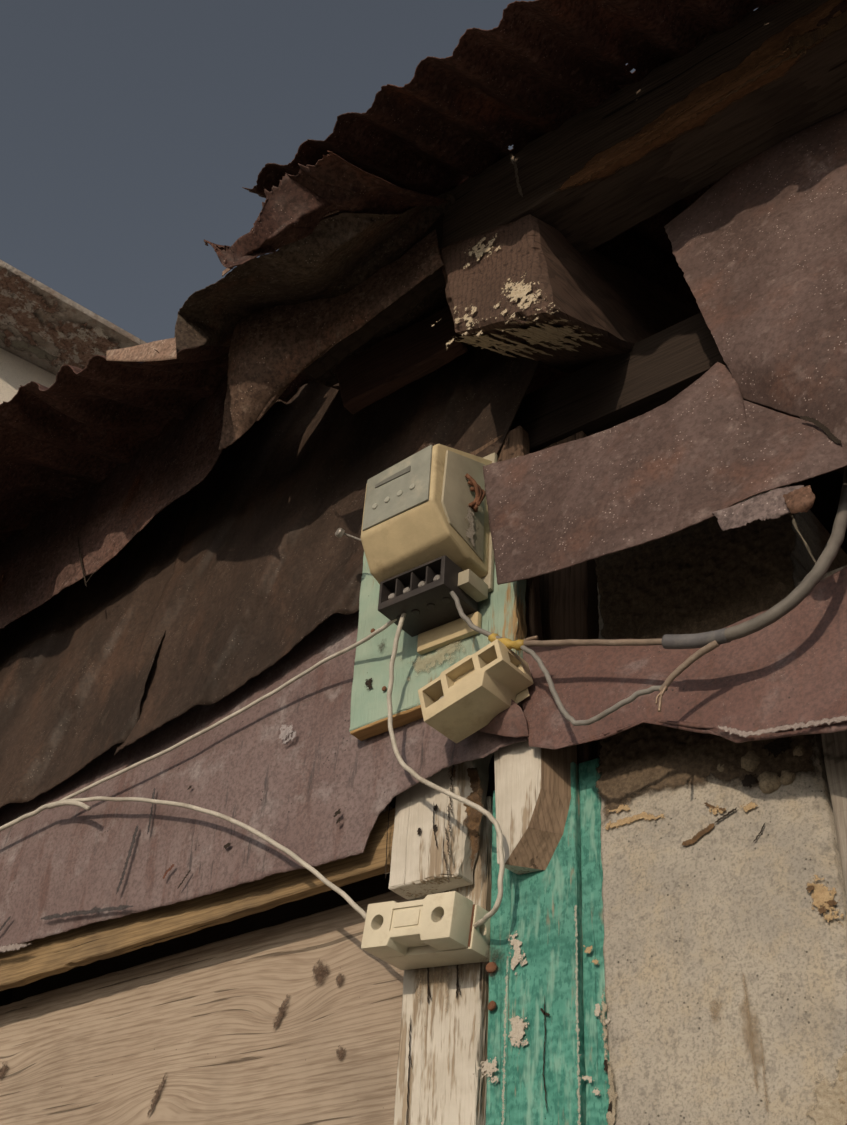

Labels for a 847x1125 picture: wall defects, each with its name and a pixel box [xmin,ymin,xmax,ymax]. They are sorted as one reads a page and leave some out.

peeling [463,233,504,269]
peeling [446,275,603,359]
spalling [595,716,847,830]
peeling [473,931,529,1125]